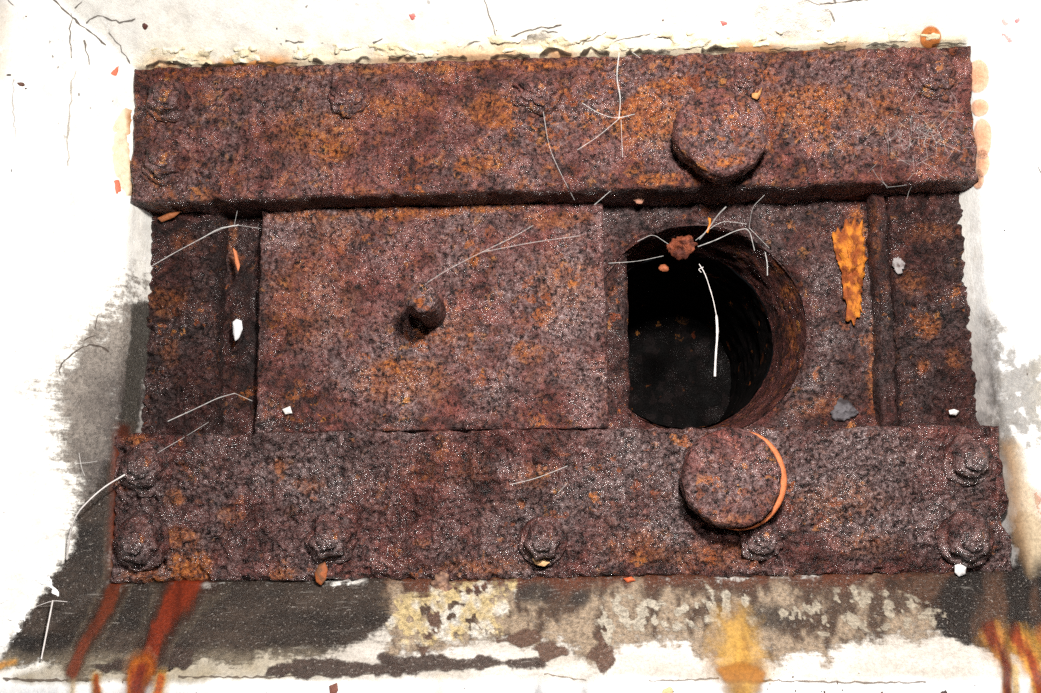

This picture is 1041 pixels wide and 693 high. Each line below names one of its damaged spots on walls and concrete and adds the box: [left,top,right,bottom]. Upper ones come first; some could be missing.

crack [54,0,135,166]
rust [971,59,992,188]
rust [658,235,698,272]
rust [832,217,868,325]
leakage [34,273,151,544]
rust [726,431,787,530]
leakage [1001,444,1041,568]
leakage [17,660,129,680]
rust [128,579,211,693]
leakage [150,580,1027,683]
rust [713,614,765,693]
rust [983,623,1041,693]